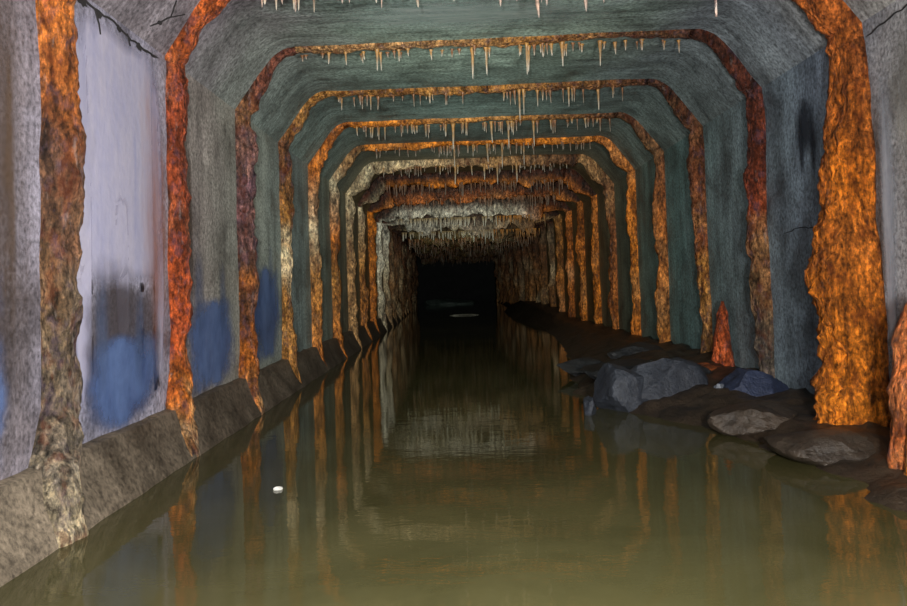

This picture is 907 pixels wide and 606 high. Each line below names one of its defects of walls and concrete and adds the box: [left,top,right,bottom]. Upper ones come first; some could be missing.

rust [28,0,89,548]
leakage [76,18,164,426]
crack [77,0,185,58]
rust [165,0,231,457]
leakage [192,302,232,385]
leakage [254,269,279,357]
rust [261,0,300,12]
rust [235,29,775,415]
rust [792,0,891,428]
crack [865,4,907,37]